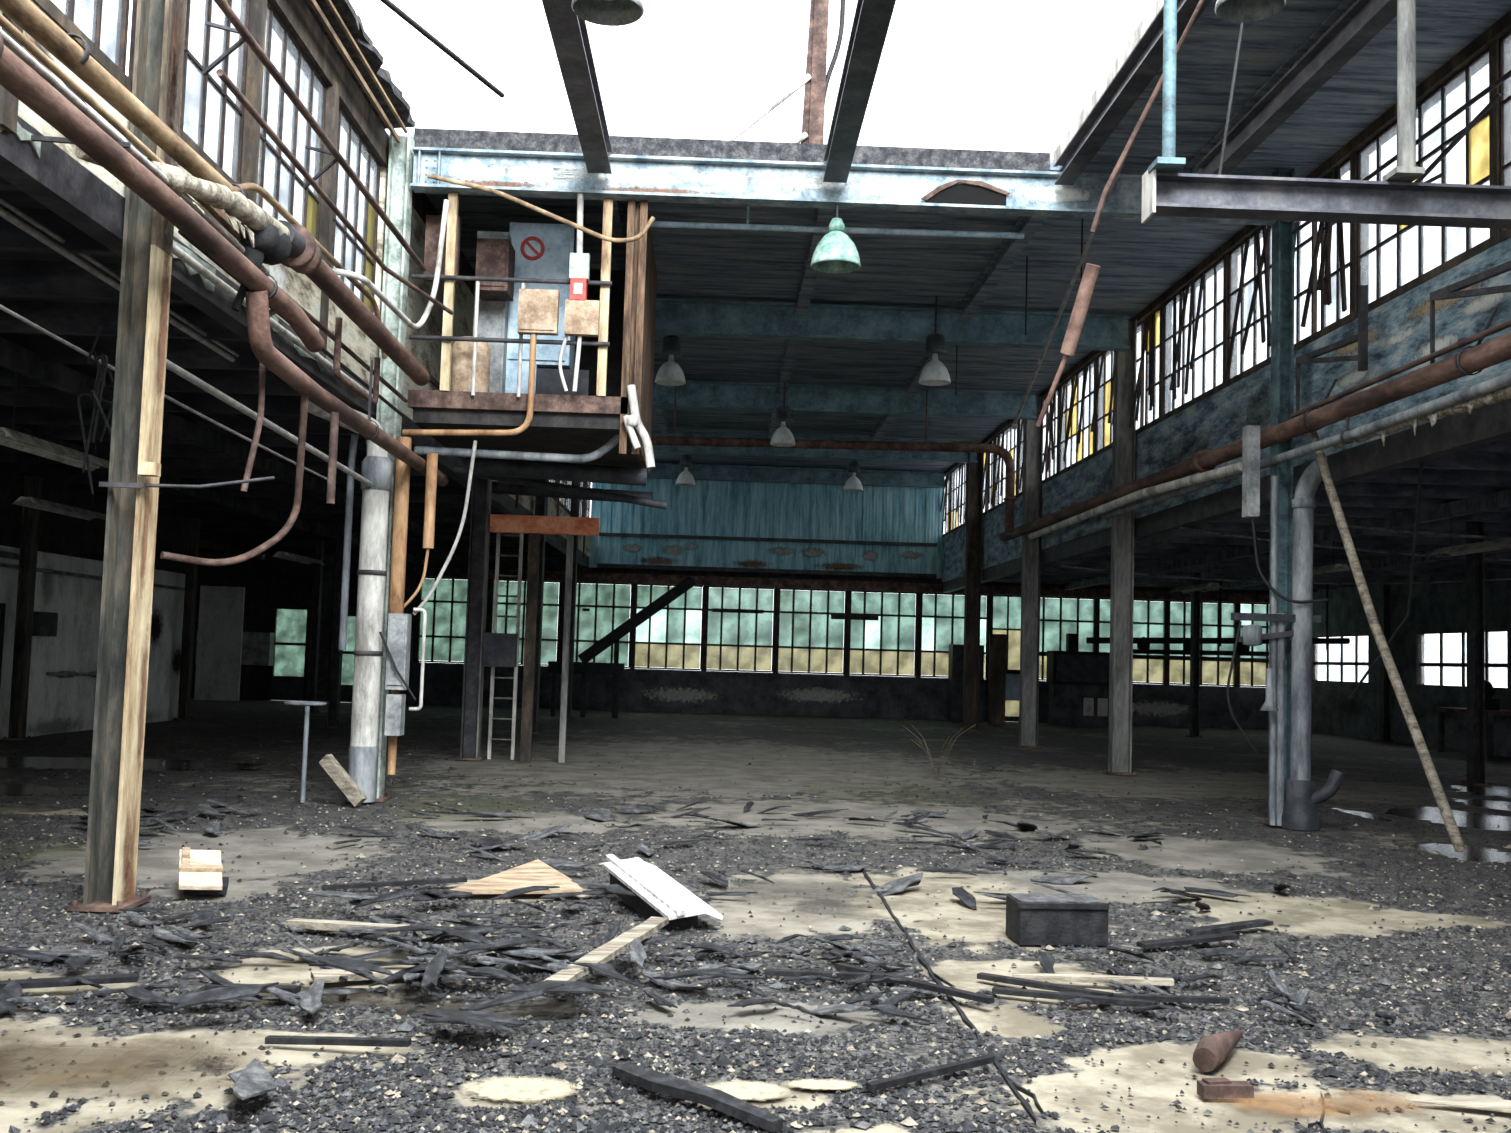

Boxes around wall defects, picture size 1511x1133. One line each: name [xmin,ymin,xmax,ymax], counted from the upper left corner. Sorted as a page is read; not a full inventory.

corrosion [169,0,180,131]
corrosion [186,193,231,231]
corrosion [158,255,169,395]
peeling [265,264,285,290]
corrosion [142,480,150,588]
corrosion [139,644,148,756]